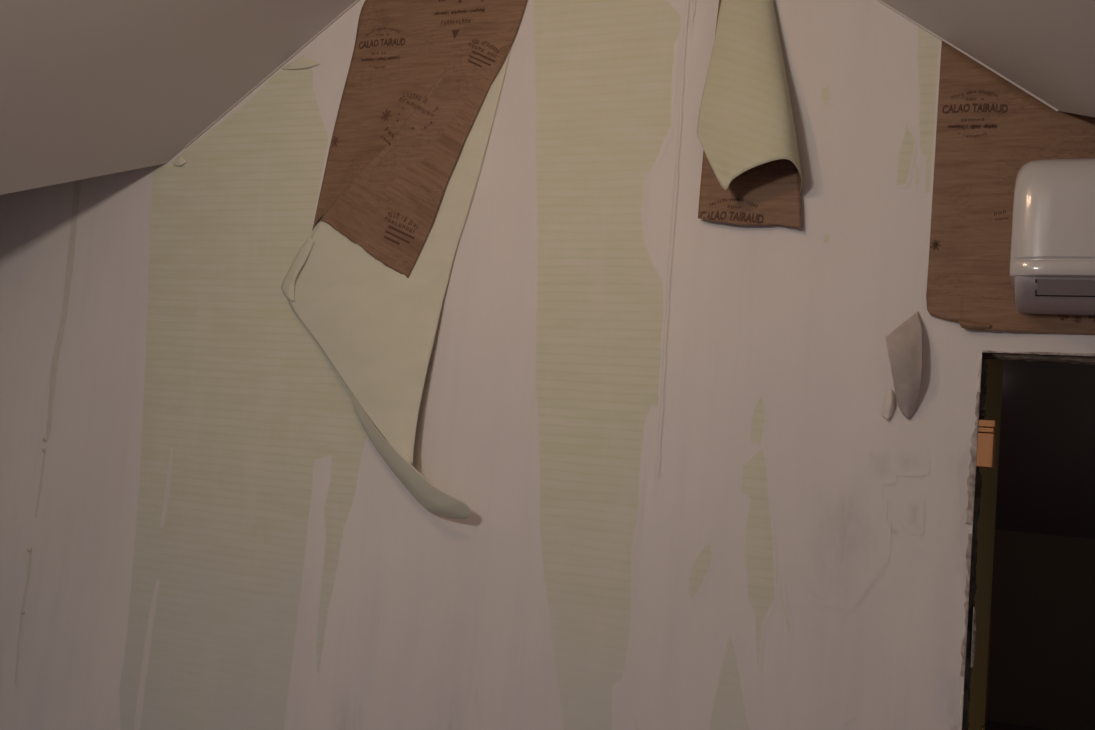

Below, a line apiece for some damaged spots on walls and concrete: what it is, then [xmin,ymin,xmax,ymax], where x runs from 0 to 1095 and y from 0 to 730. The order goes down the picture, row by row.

peeling [116,55,373,730]